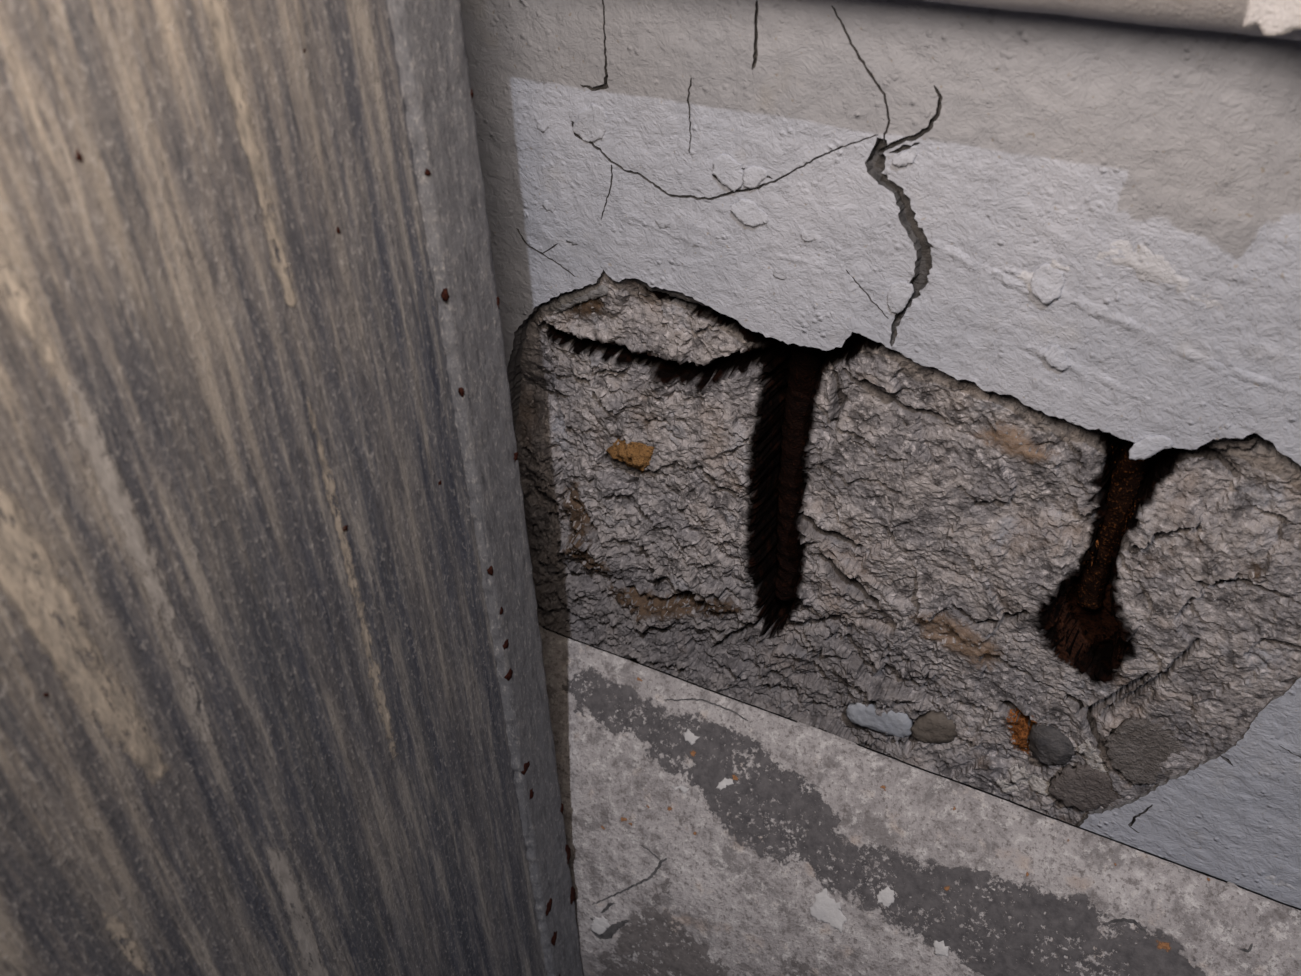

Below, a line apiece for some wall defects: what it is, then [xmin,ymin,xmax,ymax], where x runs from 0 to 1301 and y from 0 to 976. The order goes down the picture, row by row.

peeling [1242,0,1301,36]
crack [572,0,980,346]
peeling [1016,259,1070,305]
peeling [1096,240,1224,311]
spalling [507,268,1301,827]
rust [1050,540,1128,667]